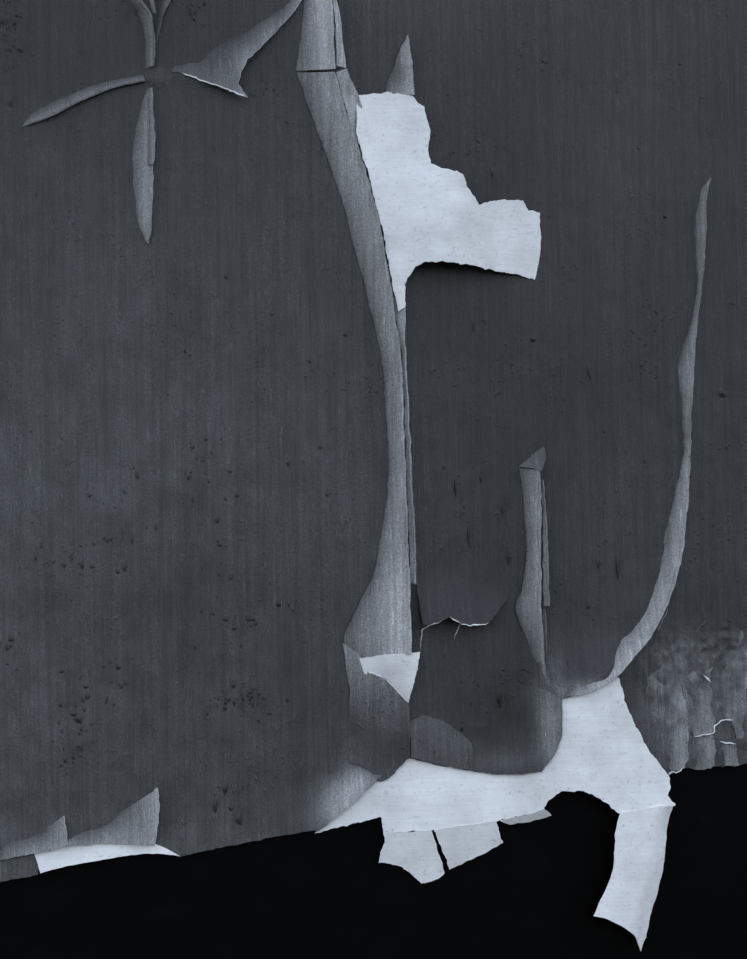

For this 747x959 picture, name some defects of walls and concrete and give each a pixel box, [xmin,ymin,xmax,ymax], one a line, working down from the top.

peeling [22,0,301,244]
peeling [295,0,711,951]
peeling [0,787,179,873]